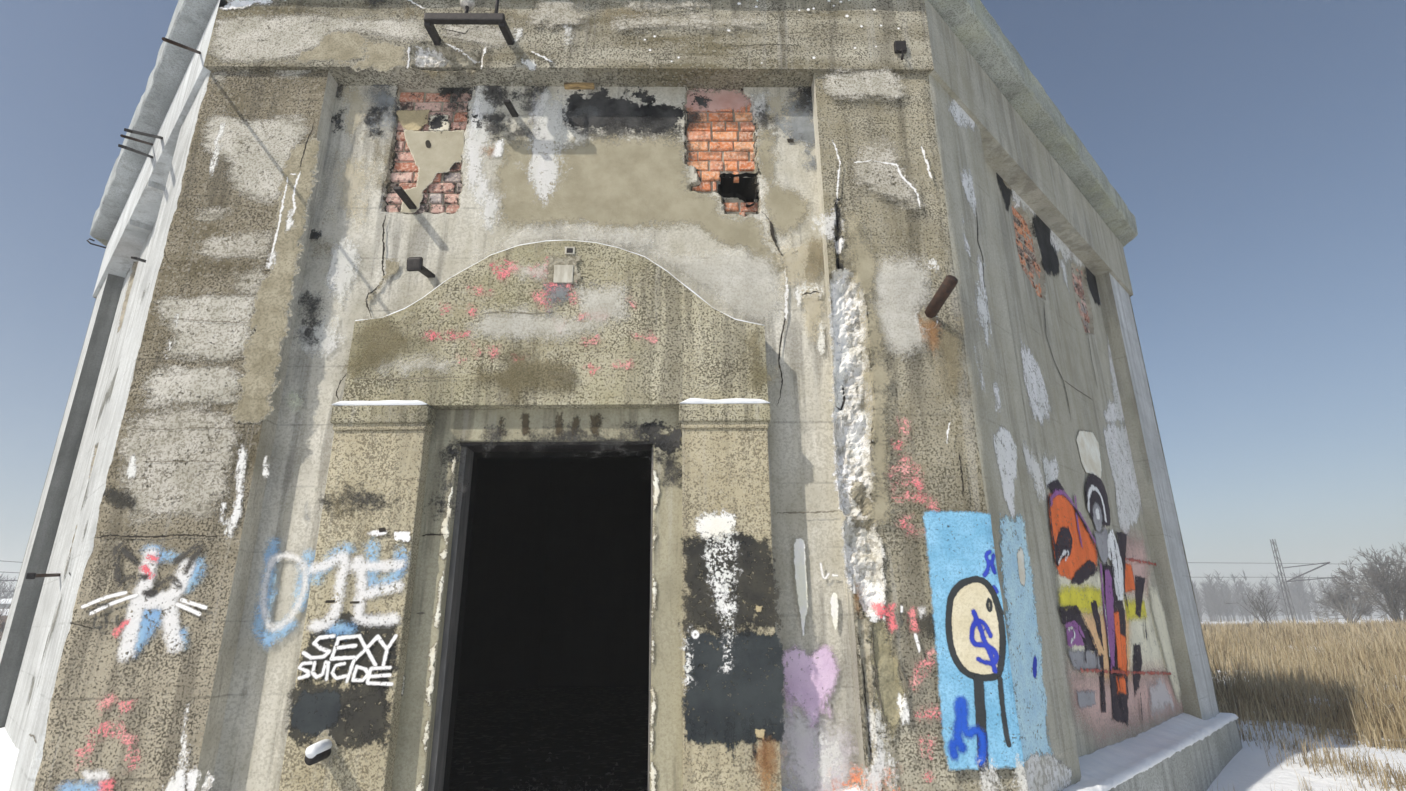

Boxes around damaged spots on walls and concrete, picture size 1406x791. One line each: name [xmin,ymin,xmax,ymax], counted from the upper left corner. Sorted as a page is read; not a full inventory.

peeling [611,0,764,30]
flaking render [209,0,585,215]
leakage [463,51,826,355]
flaking render [683,87,762,217]
leakage [472,351,578,403]
leakage [842,212,893,527]
spalling [1014,752,1072,791]